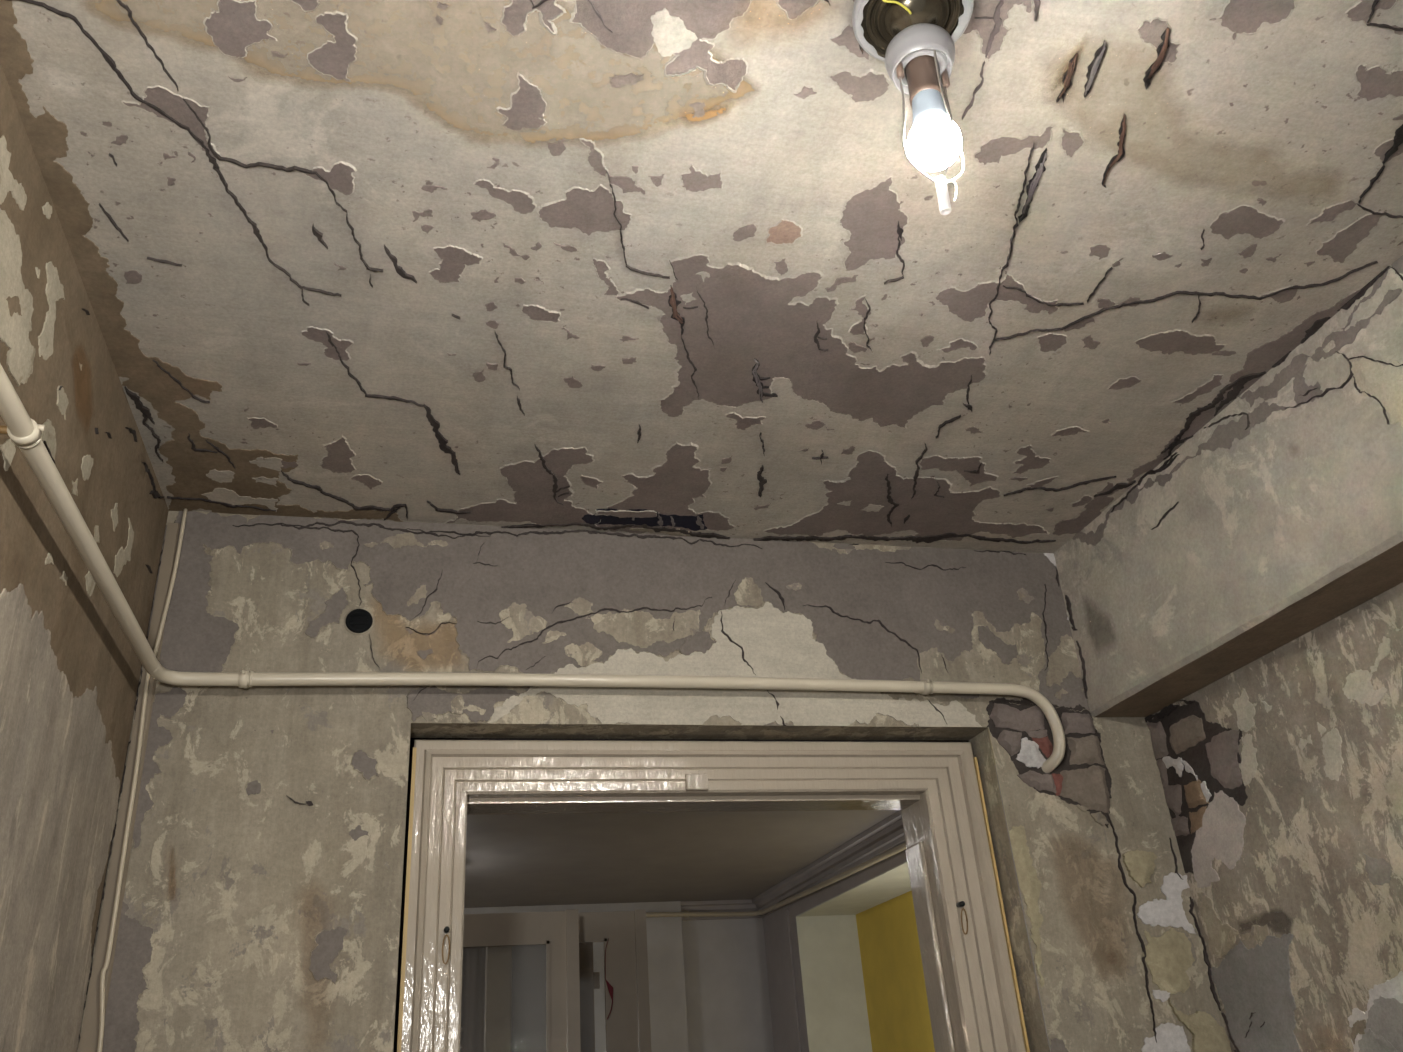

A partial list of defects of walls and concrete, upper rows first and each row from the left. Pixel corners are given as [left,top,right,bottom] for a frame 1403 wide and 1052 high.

crack [8,0,424,407]
damp [240,51,755,144]
crack [606,171,714,399]
peeling [763,255,1403,546]
crack [988,144,1403,512]
peeling [1209,181,1285,274]
peeling [1208,0,1298,45]
peeling [1354,64,1403,102]
peeling [0,0,1112,1052]
crack [79,375,1088,1042]
flaking render [1146,689,1272,875]
crack [1106,812,1157,1043]